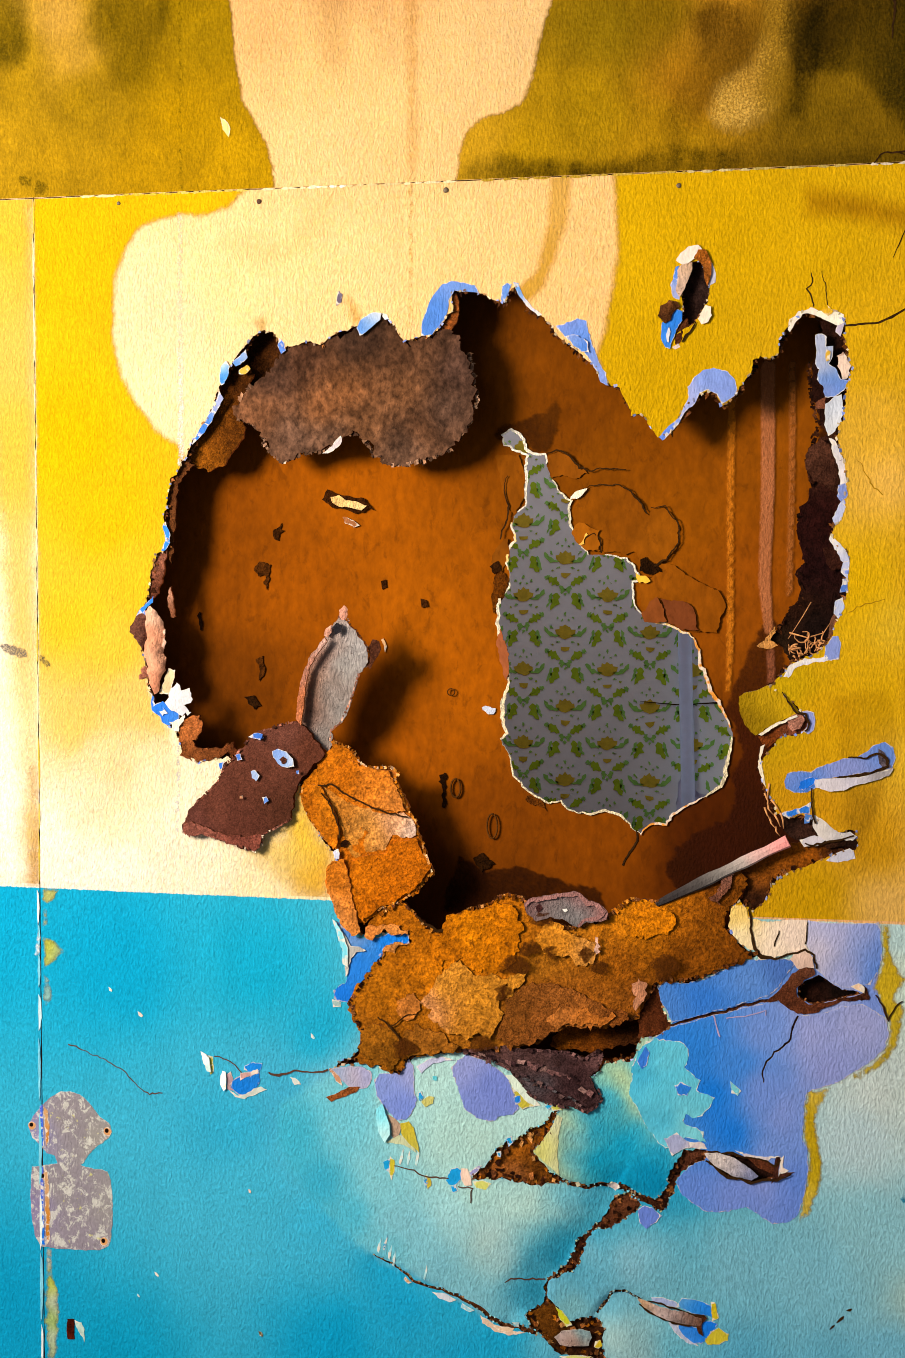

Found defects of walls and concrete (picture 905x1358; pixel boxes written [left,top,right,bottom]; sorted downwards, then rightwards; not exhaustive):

peeling [80,180,456,198]
peeling [482,164,849,182]
spalling [658,245,716,349]
peeling [130,281,905,1224]
peeling [28,529,113,1358]
crack [505,1149,708,1283]
crack [373,1236,539,1336]
spalling [524,1280,606,1358]
crack [595,1289,729,1346]